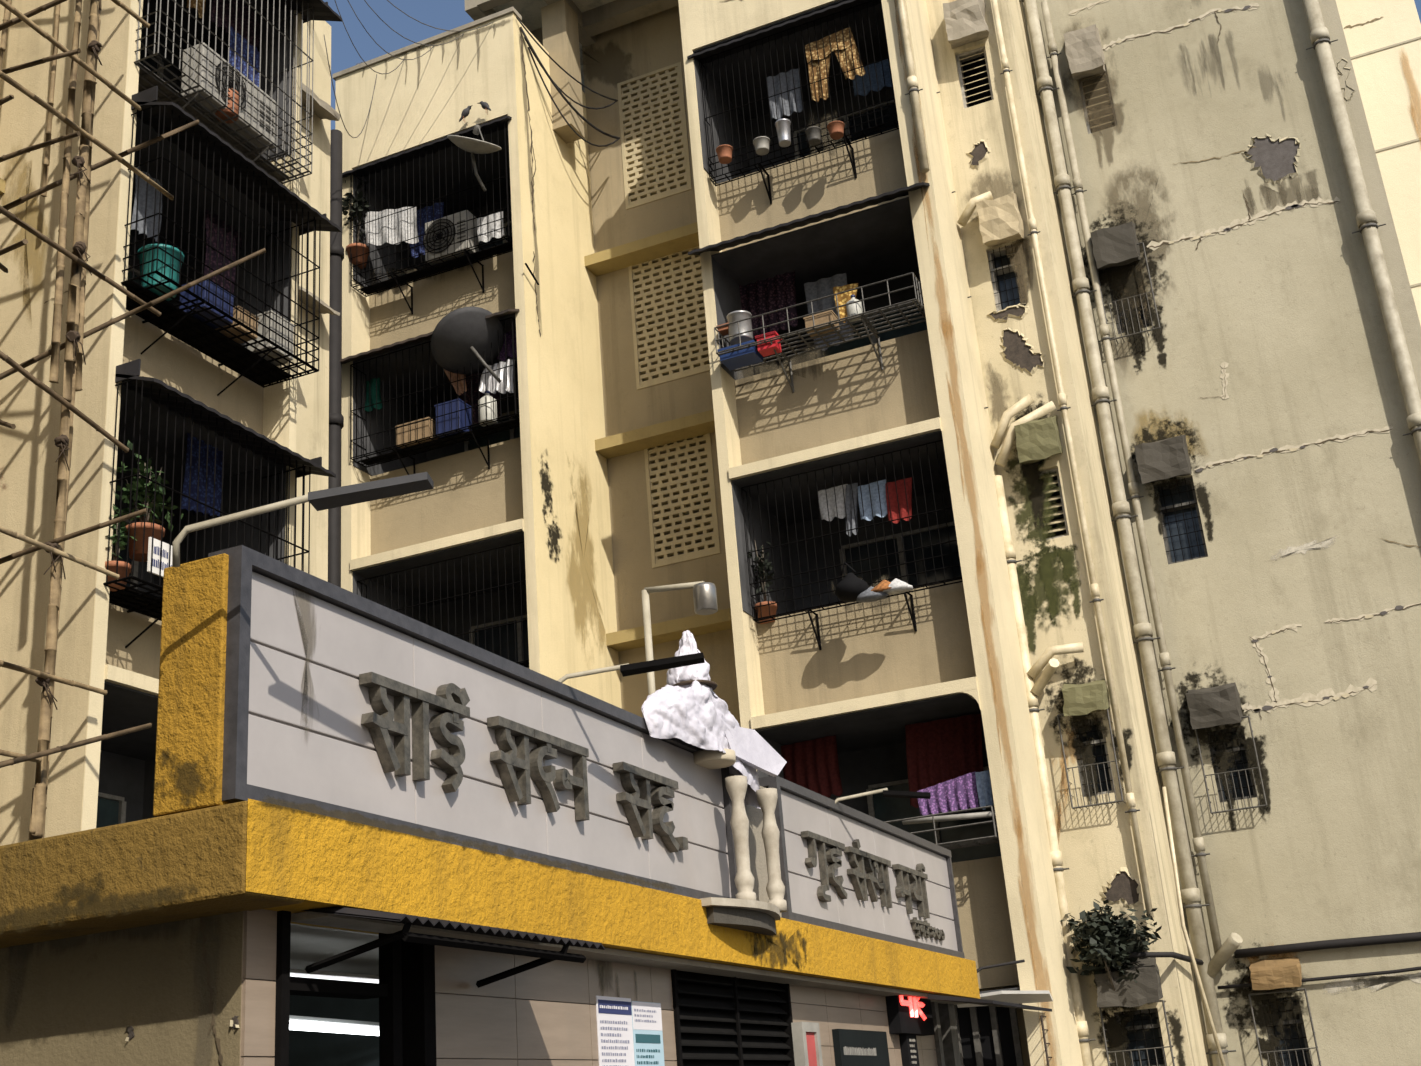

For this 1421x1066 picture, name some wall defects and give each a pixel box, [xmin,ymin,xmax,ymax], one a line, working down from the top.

crack [1103,2,1259,51]
crack [1177,146,1255,164]
flaking render [1242,133,1301,186]
crack [1147,193,1340,250]
flaking render [987,303,1046,375]
damp [1119,305,1167,372]
crack [1194,426,1393,472]
damp [1022,461,1046,528]
damp [1016,545,1081,653]
crack [1242,603,1421,720]